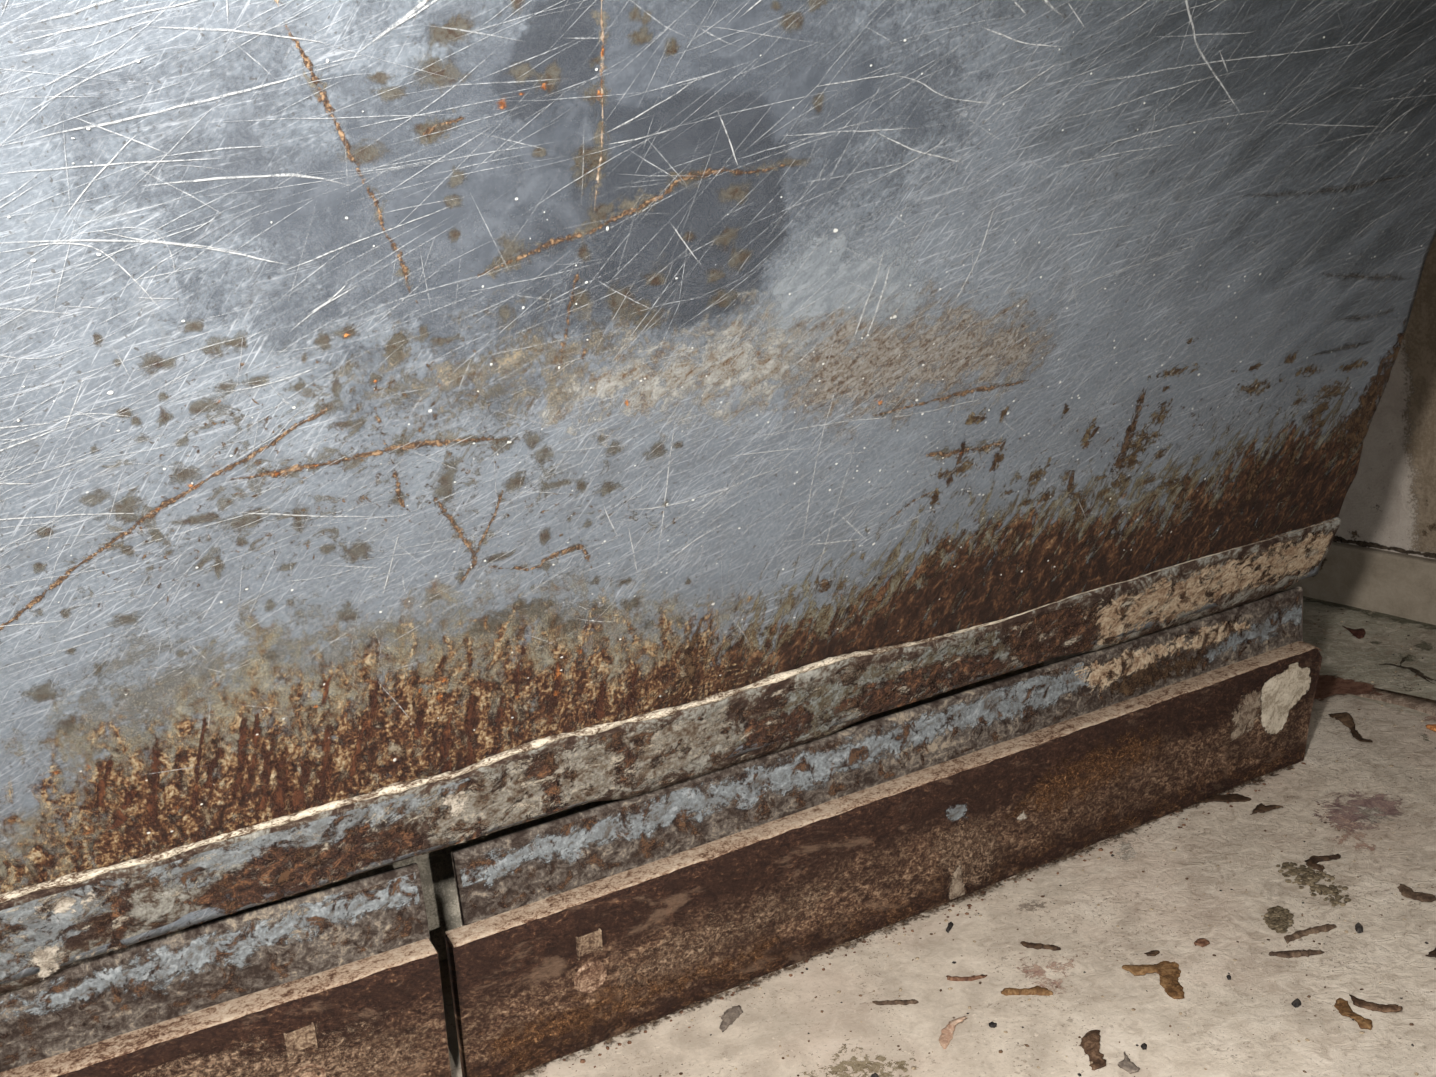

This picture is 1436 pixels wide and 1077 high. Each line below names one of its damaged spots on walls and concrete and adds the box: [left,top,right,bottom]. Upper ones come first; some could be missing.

corrosion [369,72,405,100]
peeling [0,531,1333,1016]
corrosion [0,288,1406,1066]
corrosion [132,1022,428,1077]